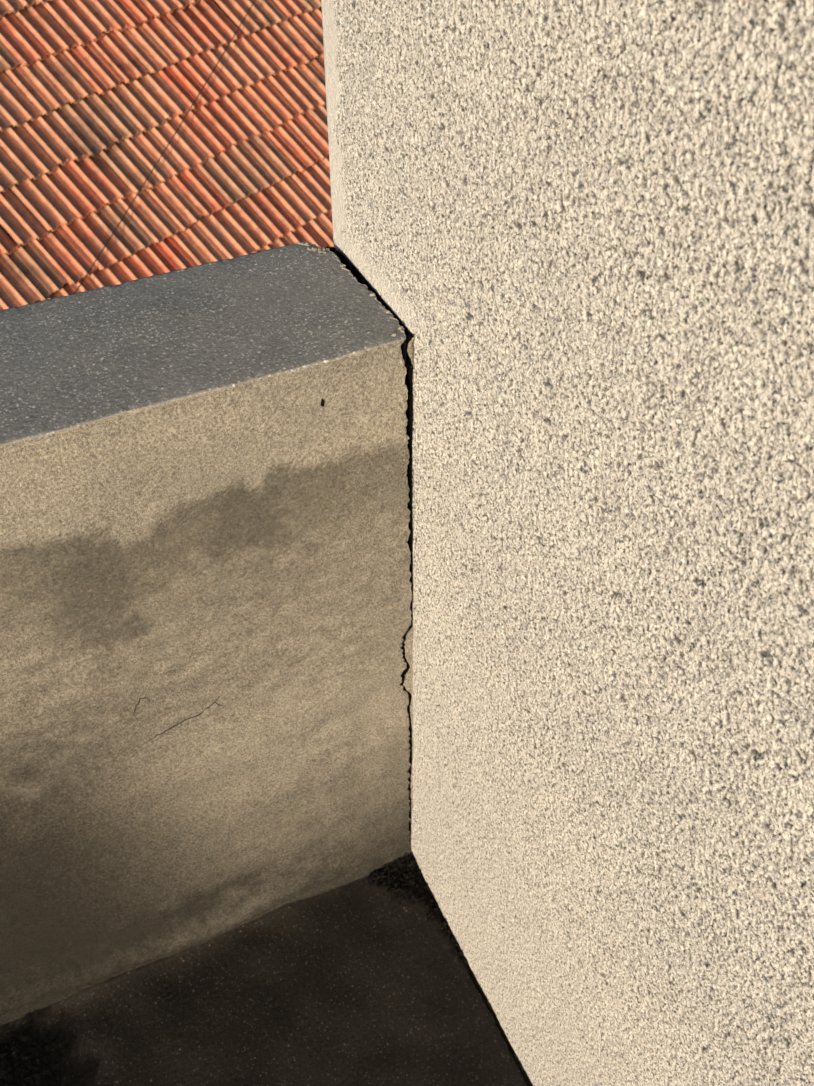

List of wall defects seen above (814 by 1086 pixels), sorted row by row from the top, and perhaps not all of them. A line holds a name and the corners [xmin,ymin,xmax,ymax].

damp [0,451,409,628]
crack [325,246,413,851]